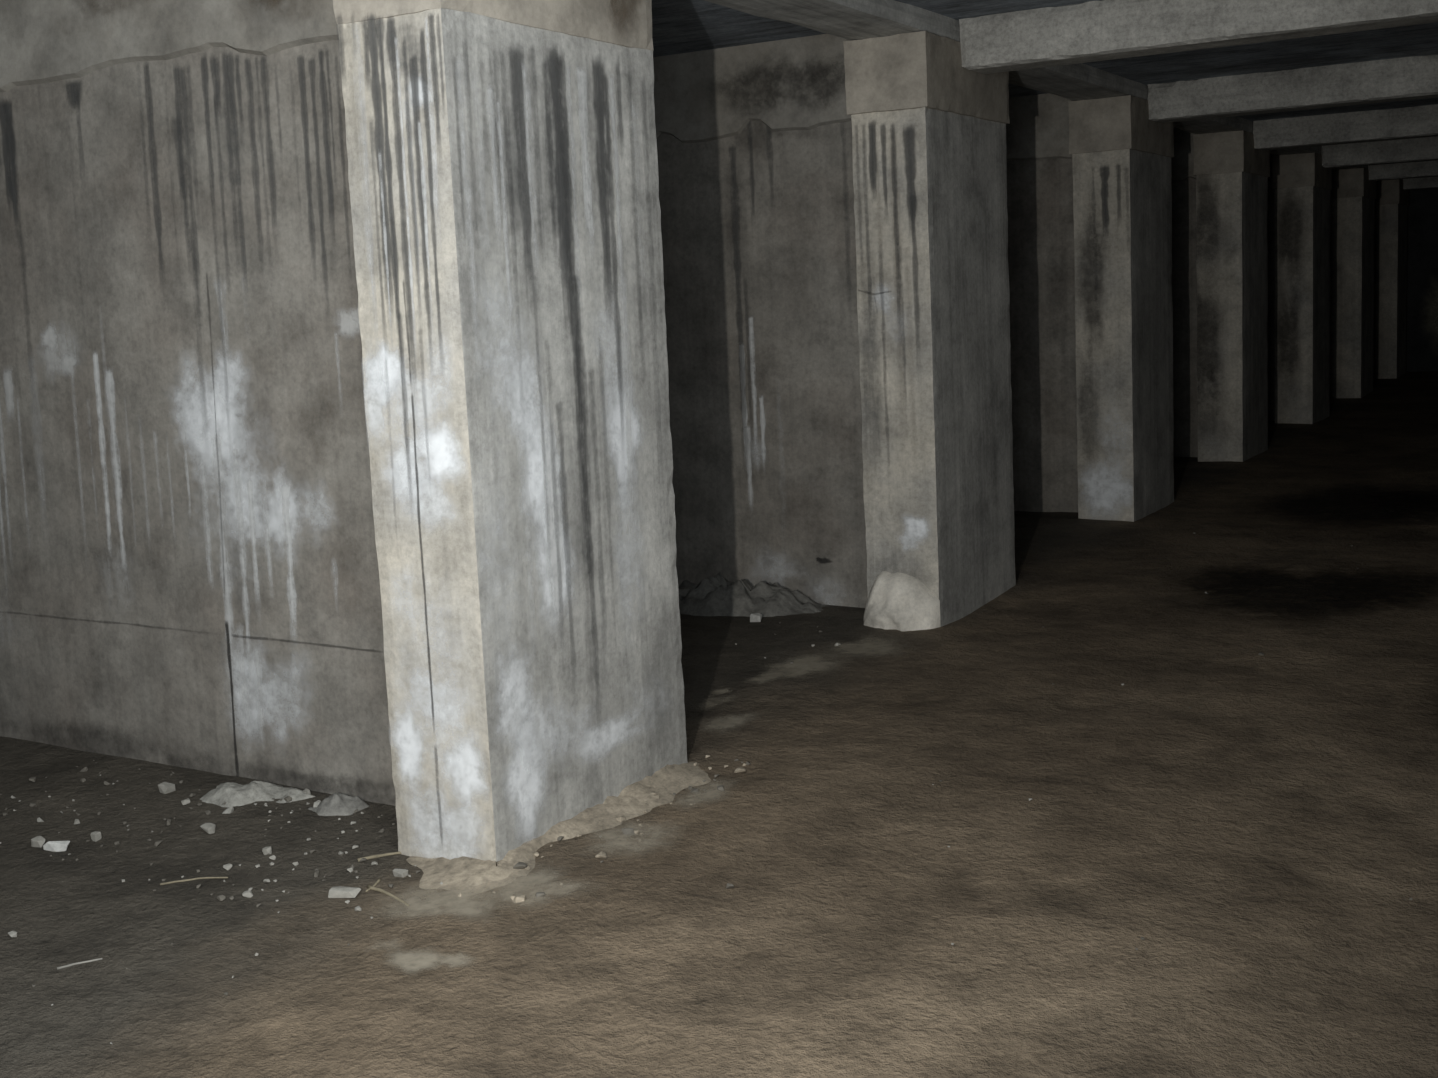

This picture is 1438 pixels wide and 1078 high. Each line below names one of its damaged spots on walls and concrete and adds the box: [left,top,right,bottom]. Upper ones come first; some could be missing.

water stain [0,103,17,217]
water stain [299,52,333,251]
water stain [364,16,441,341]
water stain [513,52,530,255]
water stain [547,55,640,515]
water stain [732,148,766,501]
water stain [869,124,916,243]
water stain [93,353,125,563]
water stain [176,359,297,731]
water stain [366,344,462,519]
water stain [508,365,570,615]
water stain [902,517,927,549]